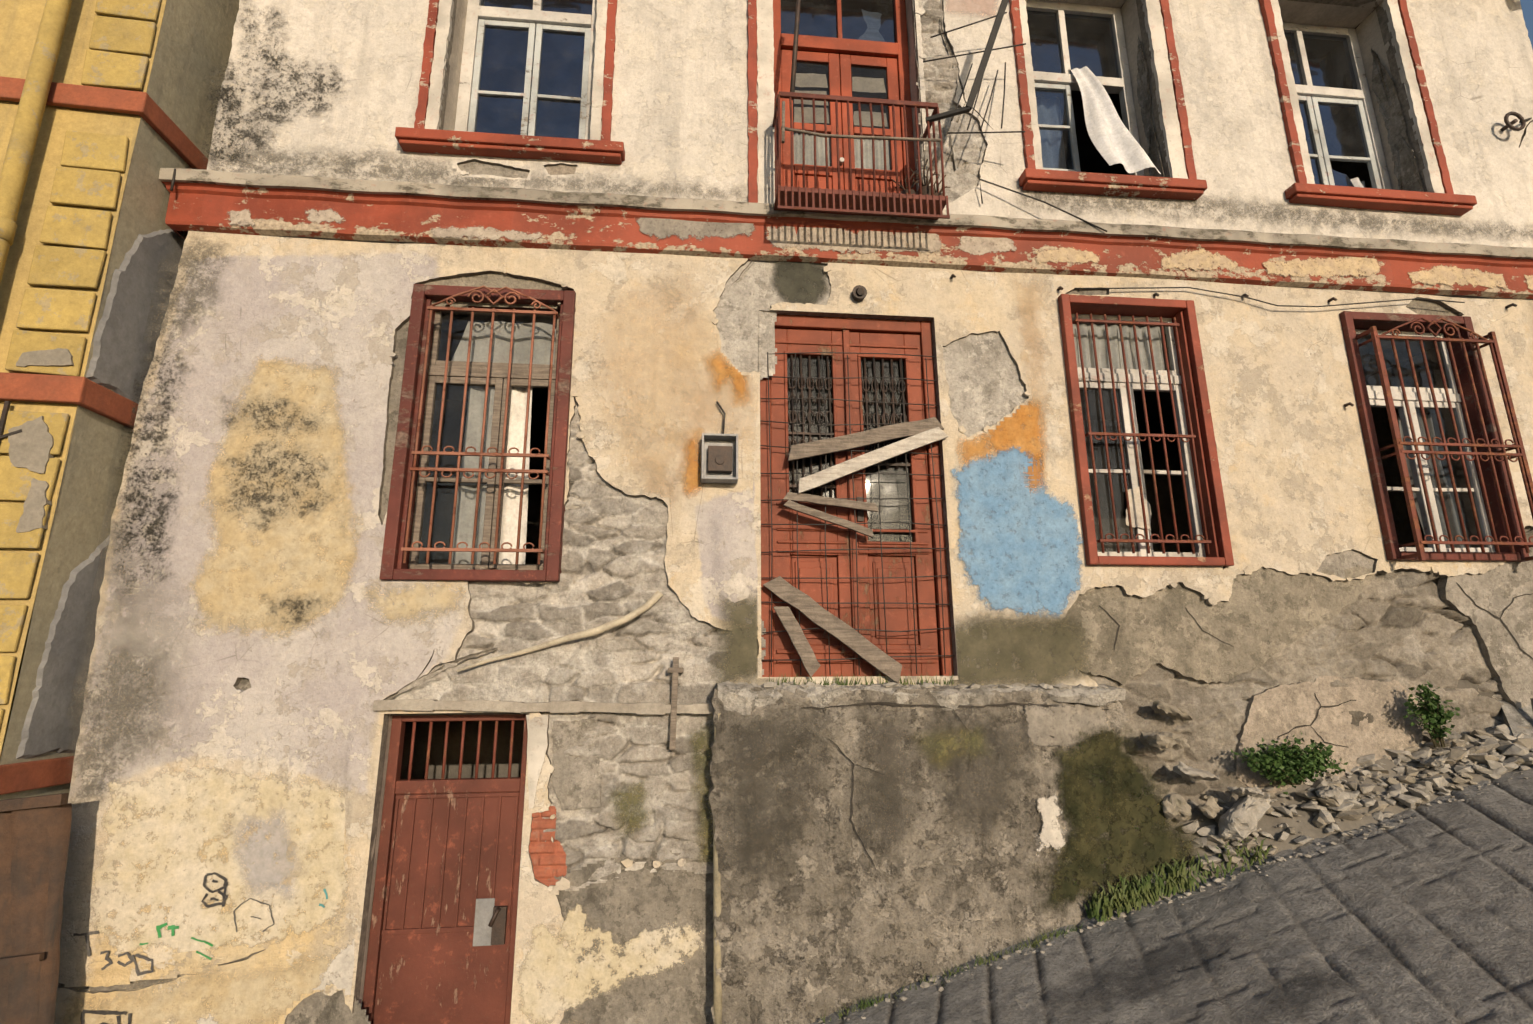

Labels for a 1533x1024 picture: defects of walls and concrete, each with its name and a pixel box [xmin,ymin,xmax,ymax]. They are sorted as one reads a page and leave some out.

damp [208,9,578,187]
spalling [913,0,987,203]
spalling [636,218,1017,380]
peeling [191,360,357,633]
damp [227,399,331,526]
damp [272,597,311,623]
spalling [369,389,766,1024]
crack [1099,605,1120,650]
spalling [1025,550,1504,805]
crack [1278,694,1357,748]
crack [1456,582,1533,659]
peeling [66,767,371,1024]